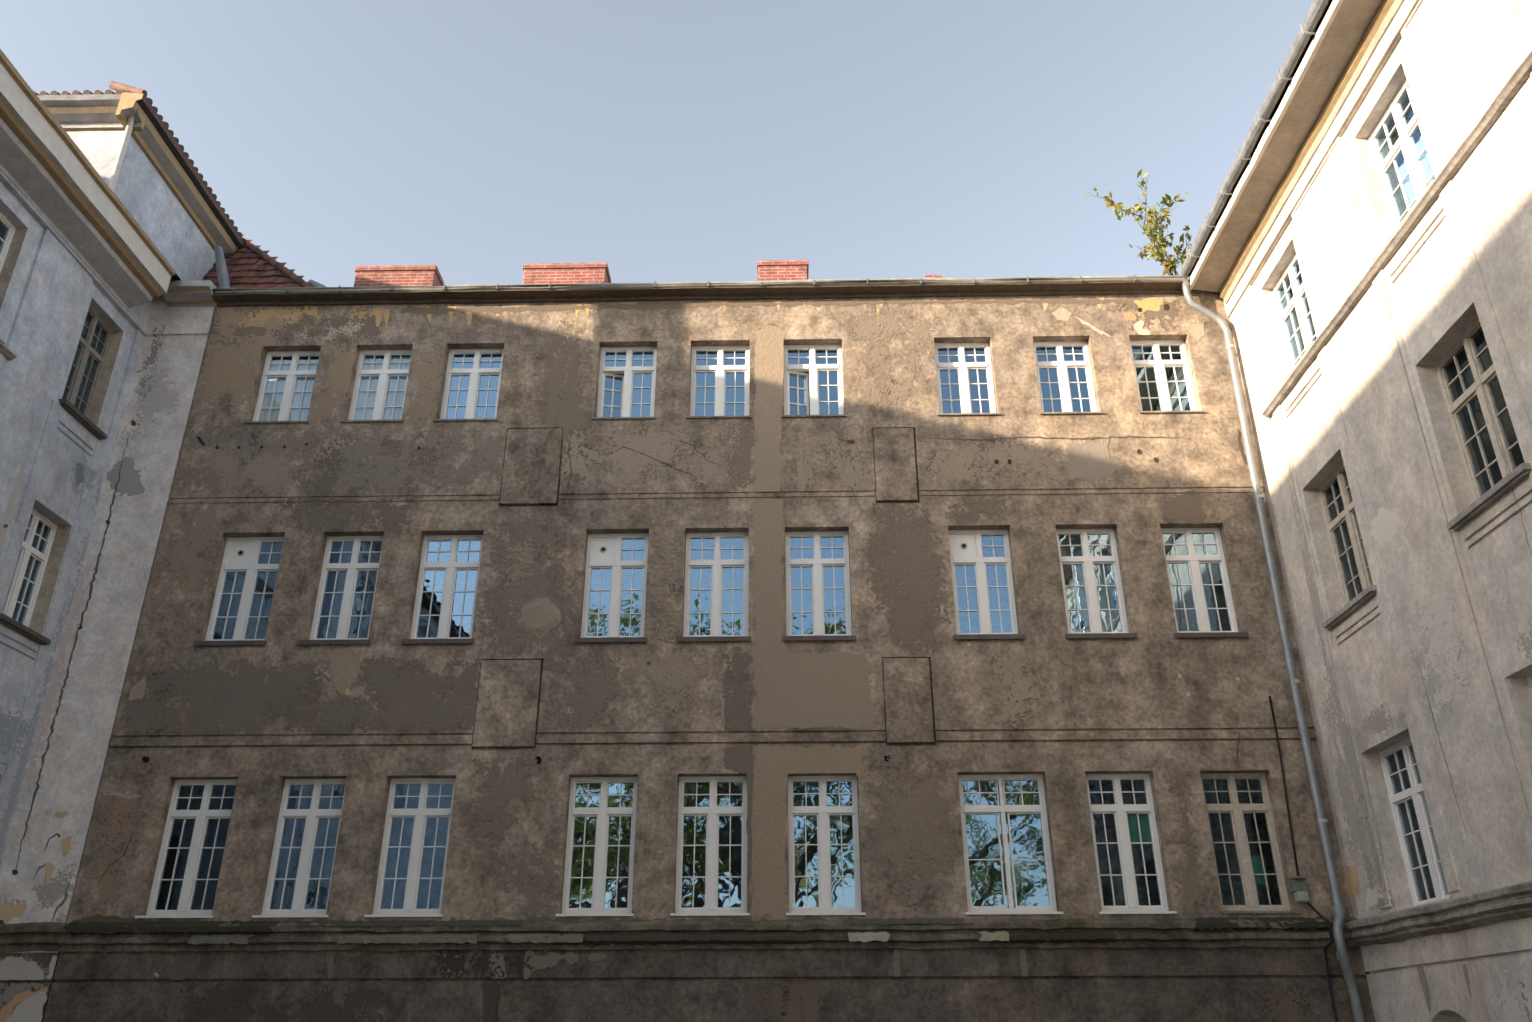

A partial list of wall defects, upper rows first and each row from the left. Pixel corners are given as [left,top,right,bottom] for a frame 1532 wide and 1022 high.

crack [15,438,135,921]
spalling [0,836,77,924]
peeling [0,955,57,1022]